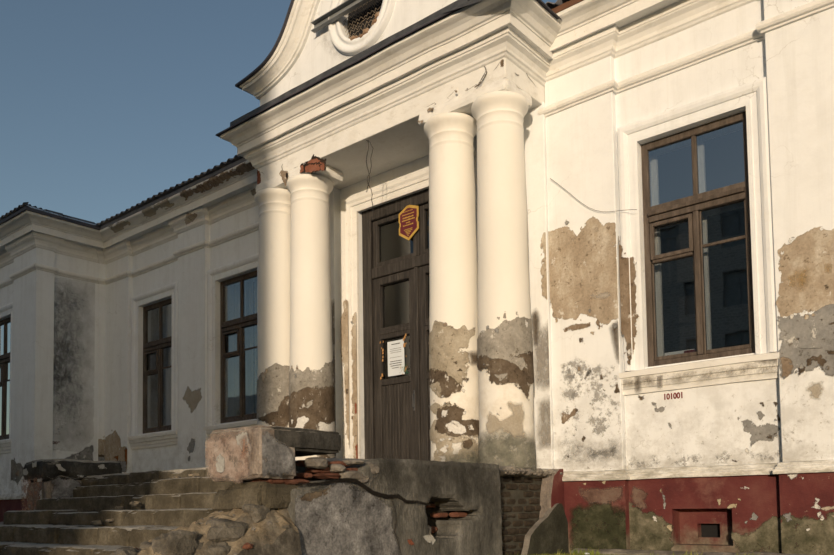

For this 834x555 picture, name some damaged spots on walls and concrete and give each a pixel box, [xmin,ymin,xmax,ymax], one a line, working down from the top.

flaking render [180,162,261,201]
flaking render [300,154,326,173]
peeling [540,217,639,364]
peeling [776,227,834,379]
peeling [183,387,202,413]
peeling [428,312,534,463]
peeling [808,383,822,398]
peeling [98,430,127,473]
crack [295,477,431,553]
peeling [629,487,674,551]
peeling [731,498,834,555]